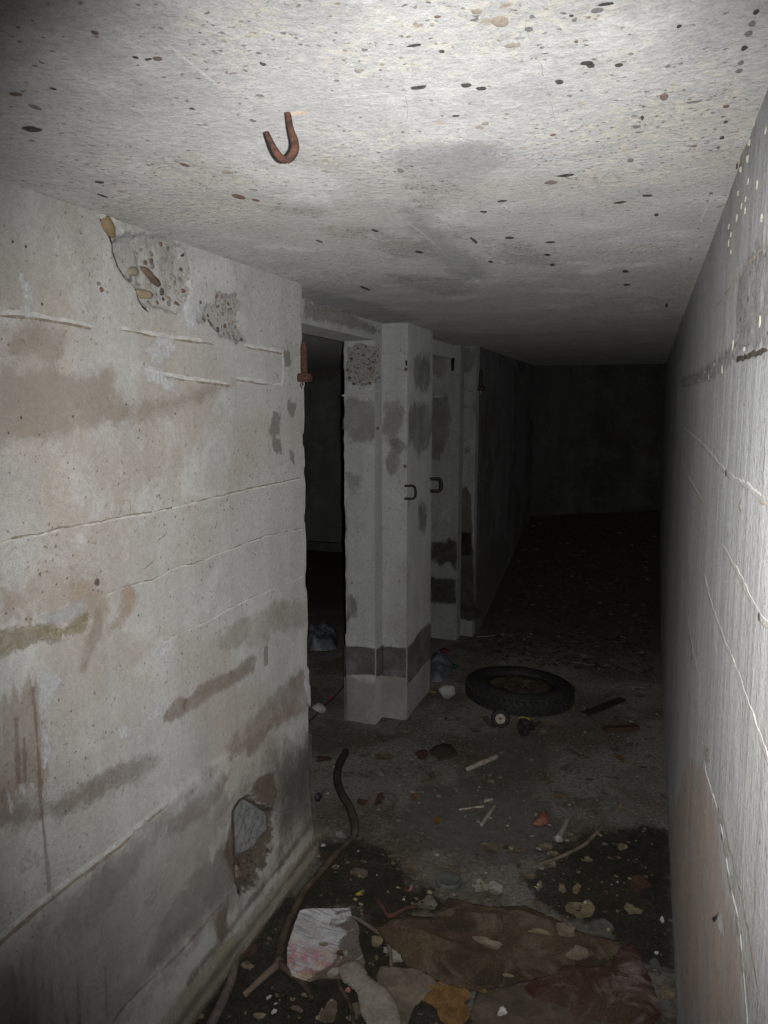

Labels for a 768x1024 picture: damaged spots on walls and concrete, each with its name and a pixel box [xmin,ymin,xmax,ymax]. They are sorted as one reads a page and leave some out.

spalling [96,213,244,344]
crack [683,428,768,505]
crack [0,477,302,595]
crack [681,574,768,764]
spalling [231,795,274,893]